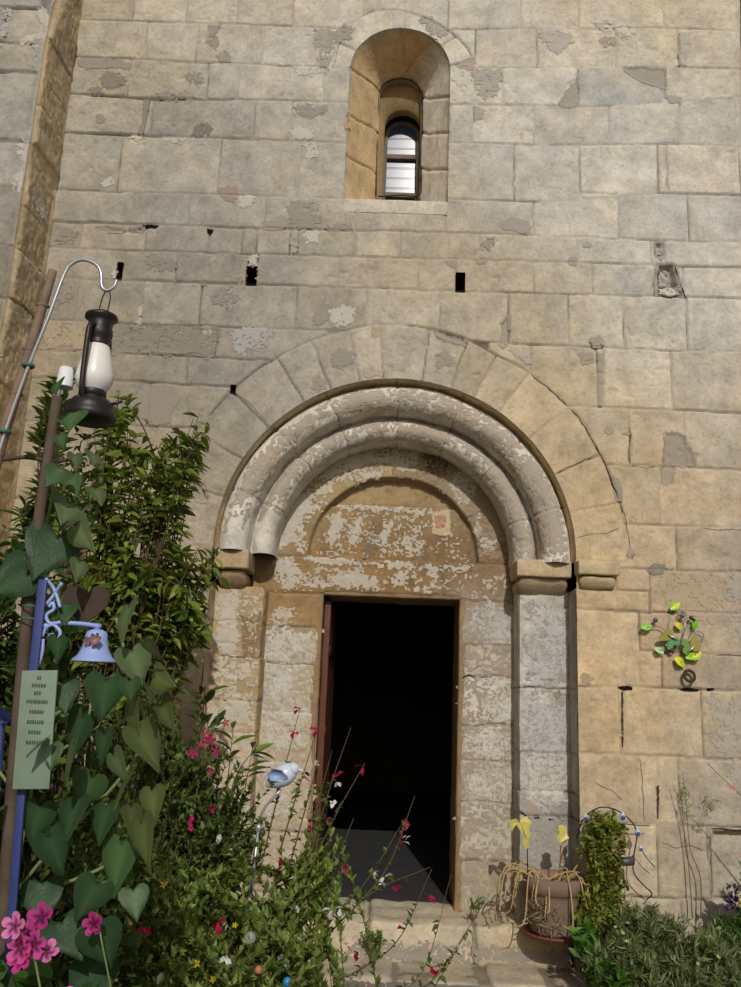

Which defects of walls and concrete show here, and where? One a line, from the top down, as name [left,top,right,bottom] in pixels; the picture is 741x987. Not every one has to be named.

peeling [204,388,595,912]